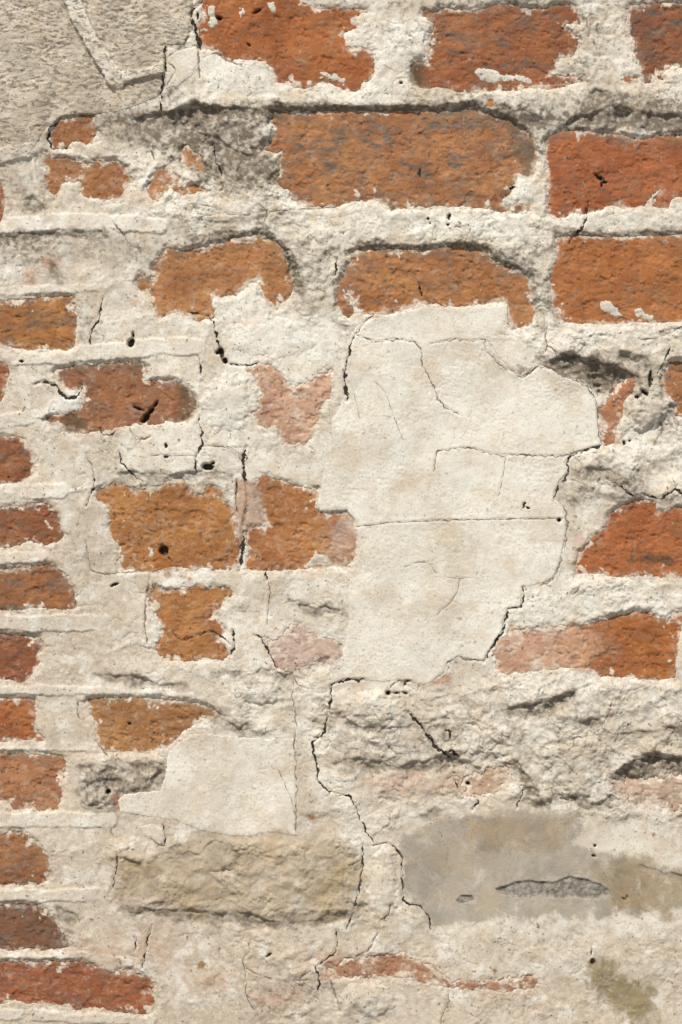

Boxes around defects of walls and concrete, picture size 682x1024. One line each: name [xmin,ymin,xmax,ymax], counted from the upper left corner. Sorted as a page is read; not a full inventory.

flaking render [165,0,375,92]
flaking render [399,4,583,94]
flaking render [263,107,682,226]
flaking render [136,234,295,322]
flaking render [550,234,682,325]
crack [189,312,258,373]
crack [642,326,682,373]
flaking render [96,475,356,587]
crack [343,315,602,810]
crack [100,417,431,1011]
water stain [400,811,682,925]
flaking render [0,903,155,1015]